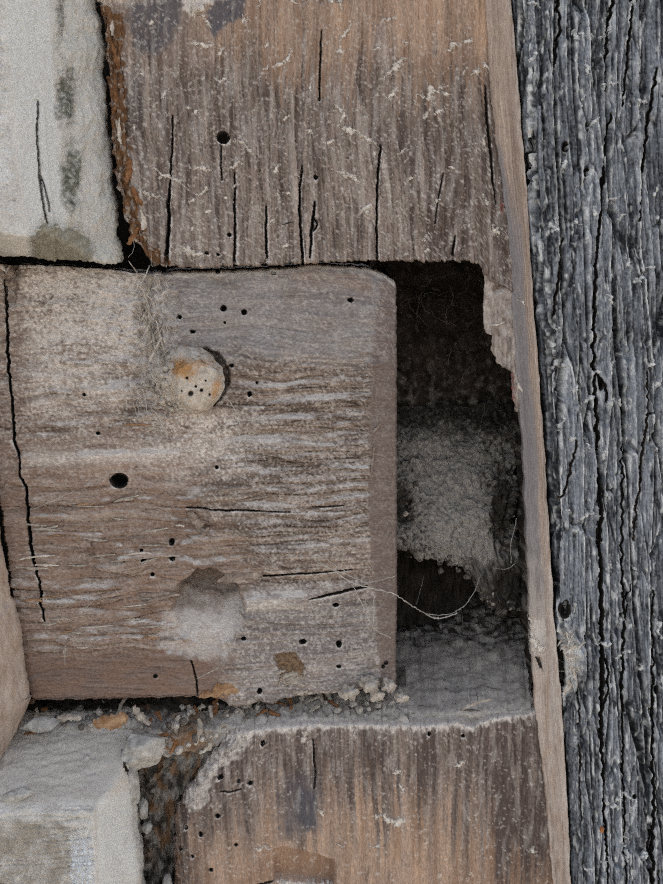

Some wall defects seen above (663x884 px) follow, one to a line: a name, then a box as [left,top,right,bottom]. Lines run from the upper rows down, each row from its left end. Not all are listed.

crack [4,280,45,622]
leakage [0,821,93,884]